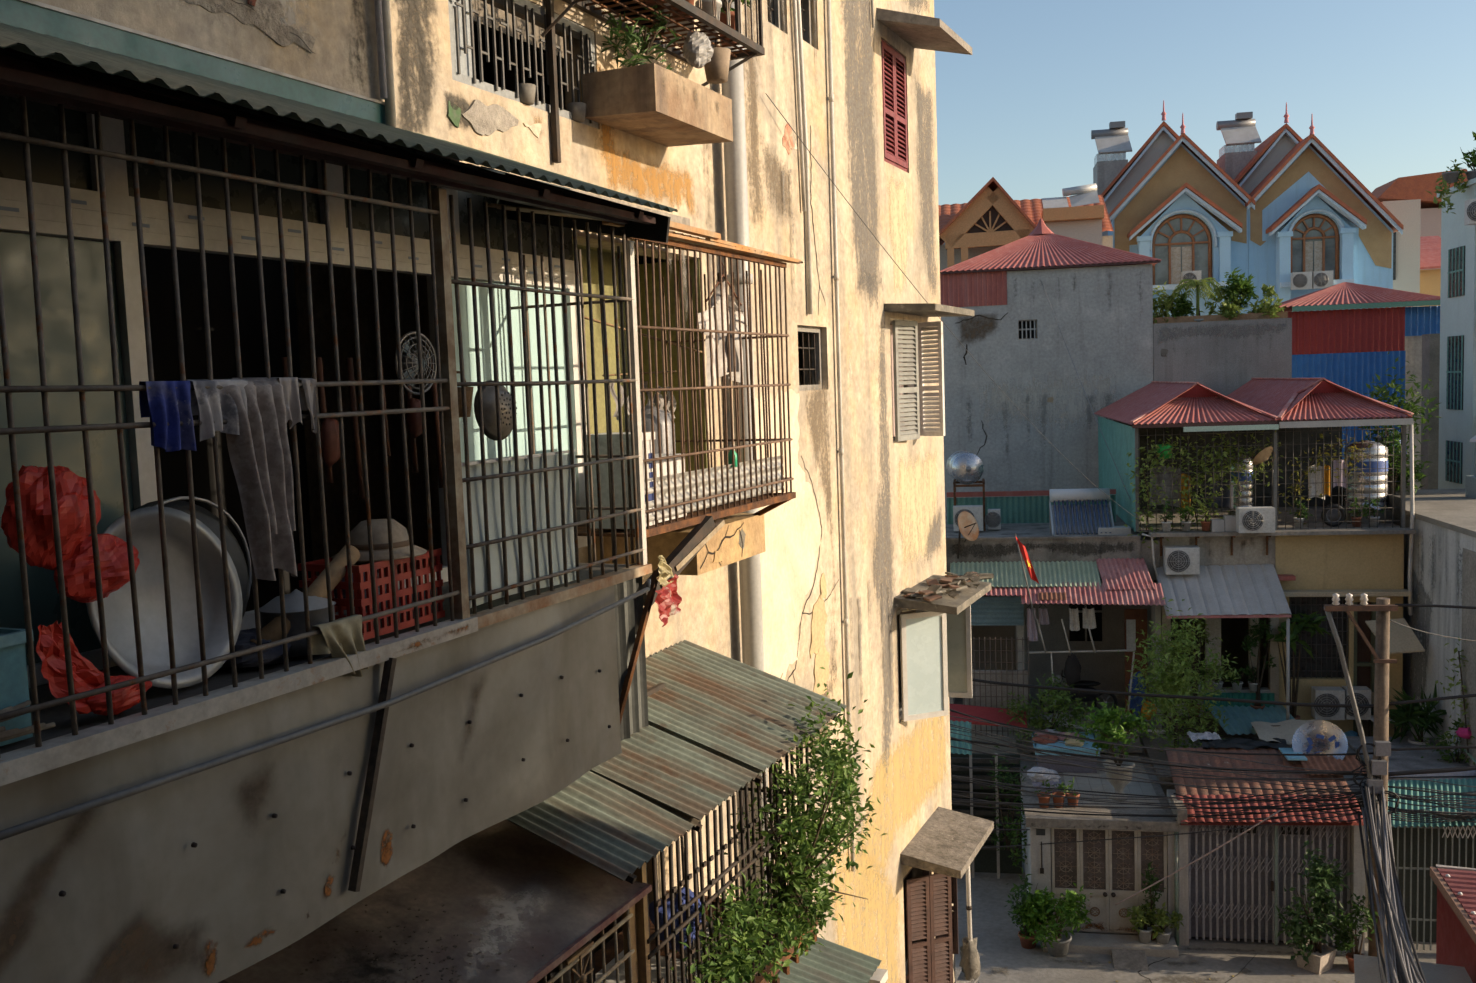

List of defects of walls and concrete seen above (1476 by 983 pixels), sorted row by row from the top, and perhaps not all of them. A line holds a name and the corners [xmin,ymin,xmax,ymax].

spalling [184,0,316,53]
leakage [395,0,435,132]
leakage [0,810,91,971]
corrosion [381,830,393,866]